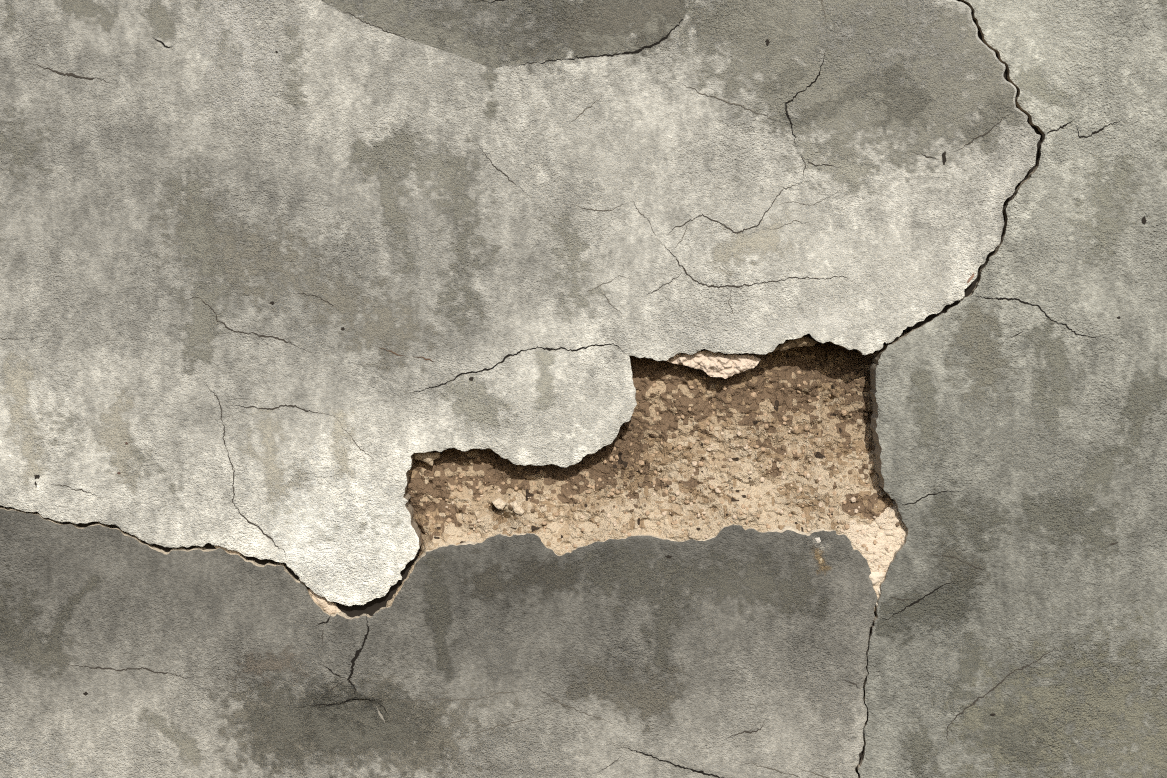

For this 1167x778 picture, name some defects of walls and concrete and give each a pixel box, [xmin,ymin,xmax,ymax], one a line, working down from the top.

crack [512,7,687,66]
crack [571,53,848,314]
spalling [946,0,1045,313]
crack [908,0,1126,338]
crack [381,343,625,393]
crack [0,384,376,589]
spalling [0,314,941,778]
crack [899,489,965,505]
crack [68,664,193,678]
crack [294,555,985,778]